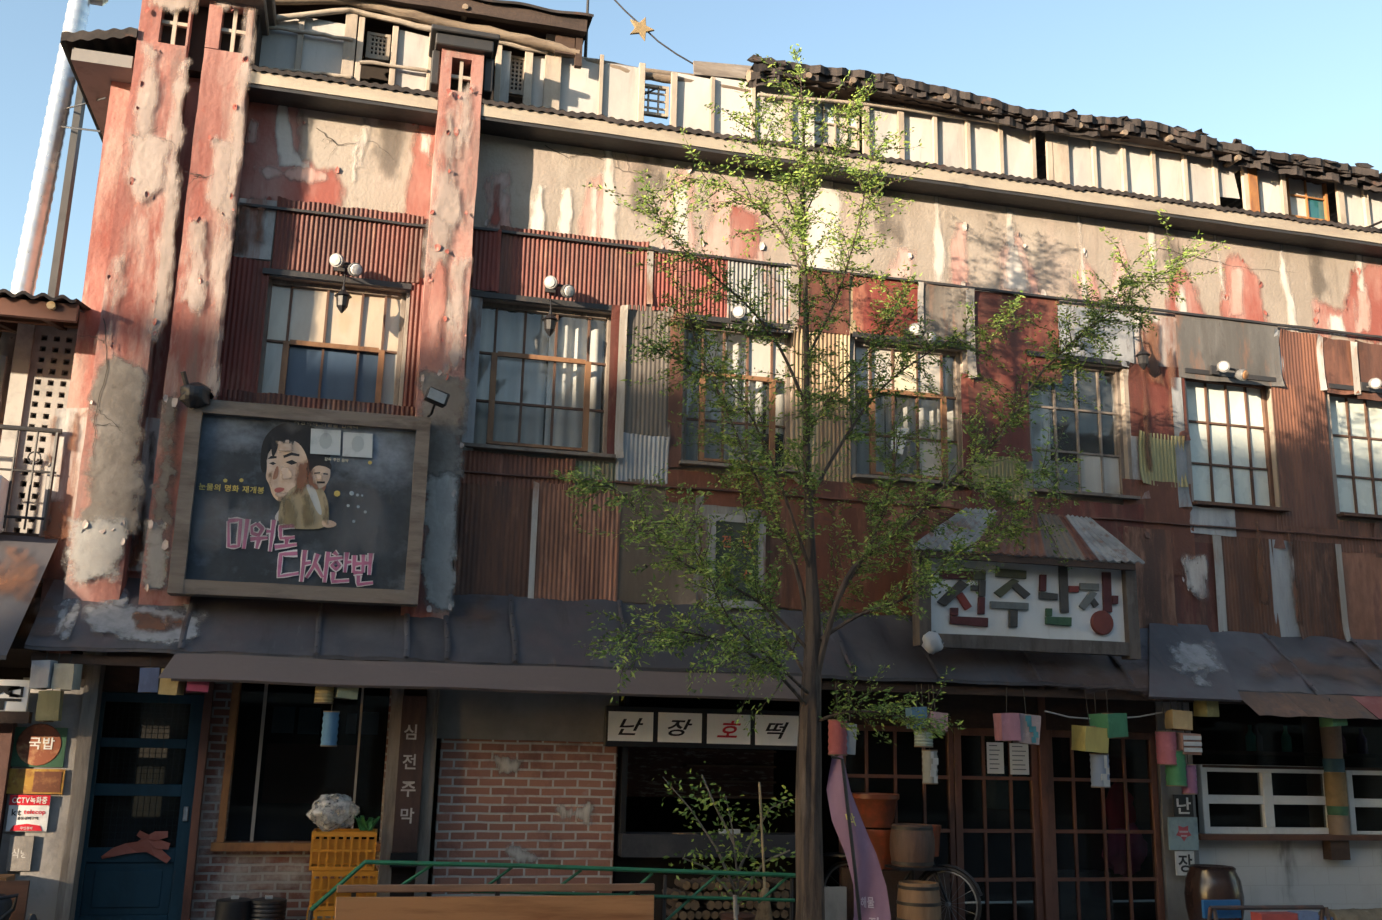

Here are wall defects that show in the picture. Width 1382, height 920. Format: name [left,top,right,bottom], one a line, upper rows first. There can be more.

peeling [128,0,344,343]
peeling [405,86,473,382]
peeling [579,175,603,238]
peeling [660,165,765,261]
peeling [805,179,842,270]
peeling [887,248,913,279]
peeling [999,232,1046,295]
peeling [1074,240,1128,309]
peeling [1165,255,1267,322]
peeling [1311,263,1382,344]
spalling [208,364,220,395]
rust [1140,321,1175,388]